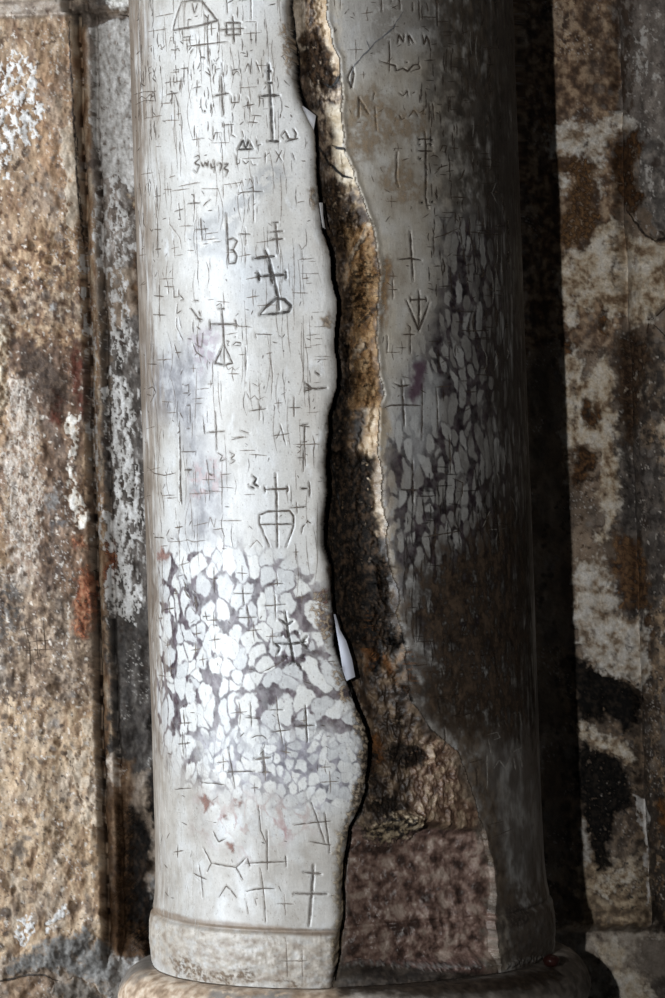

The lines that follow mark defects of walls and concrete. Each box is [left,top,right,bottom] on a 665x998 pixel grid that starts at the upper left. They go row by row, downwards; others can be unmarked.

crack [626,209,665,242]
crack [647,307,665,336]
crack [290,1,404,981]
leakage [105,765,155,959]